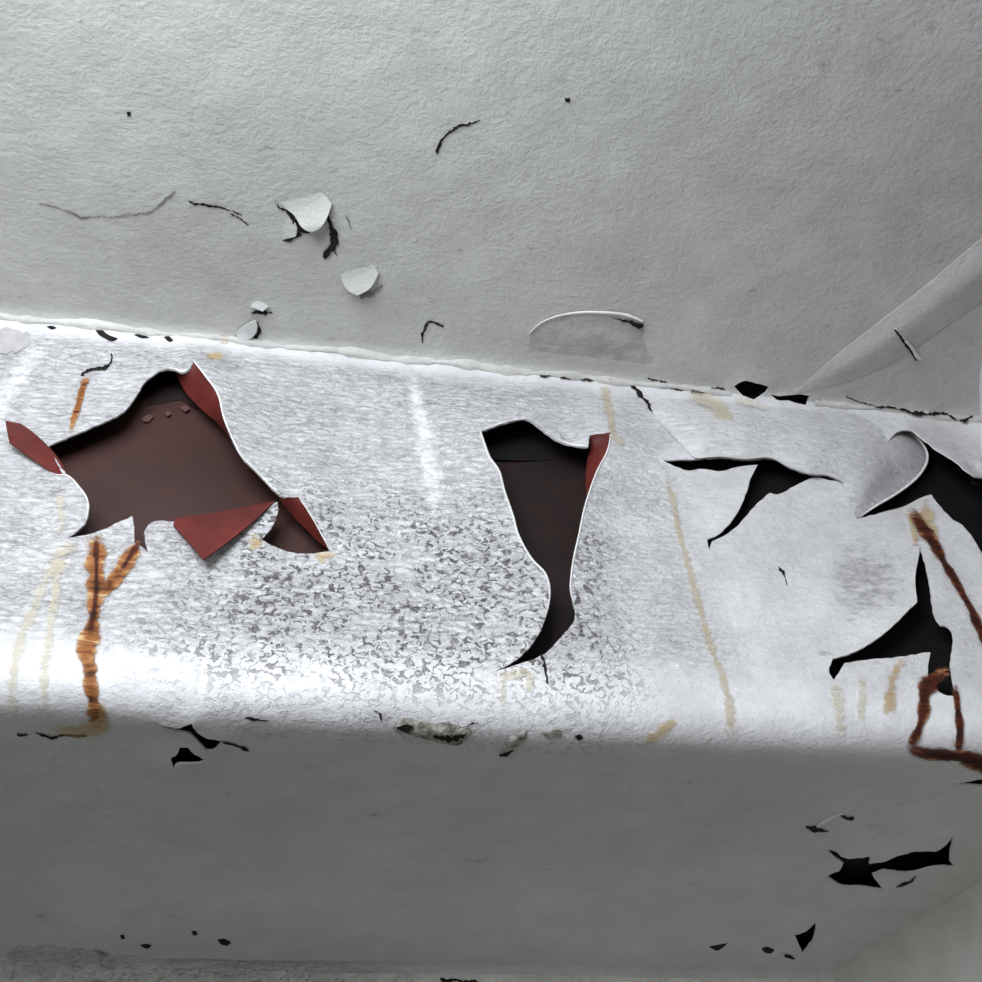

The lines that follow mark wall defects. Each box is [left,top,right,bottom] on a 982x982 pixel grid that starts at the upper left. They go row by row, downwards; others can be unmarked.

crack [435,120,480,154]
crack [39,191,249,226]
corrosion [55,536,140,738]
peeling [6,360,331,560]
peeling [480,418,612,683]
peeling [674,460,814,548]
peeling [829,550,954,696]
crack [846,396,974,423]
corrosion [907,506,982,642]
peeling [908,458,982,553]
corrosion [908,669,982,774]
spalling [829,838,952,888]